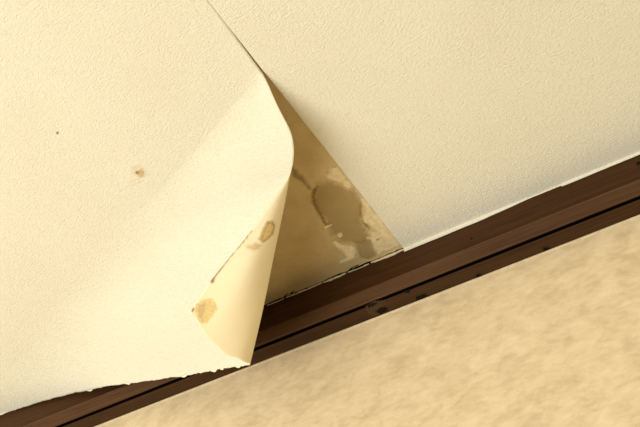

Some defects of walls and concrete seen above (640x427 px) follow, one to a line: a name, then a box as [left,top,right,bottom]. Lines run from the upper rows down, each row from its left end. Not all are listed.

spalling [367,301,388,315]